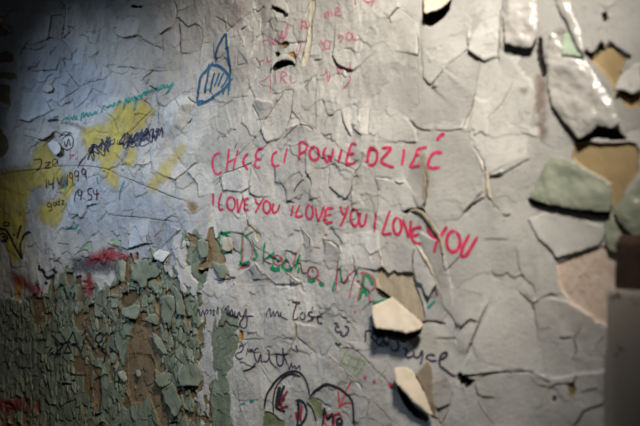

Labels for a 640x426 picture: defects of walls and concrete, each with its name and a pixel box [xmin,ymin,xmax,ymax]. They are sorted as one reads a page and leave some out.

crack [44,1,209,134]
flaking render [271,0,316,70]
peeling [423,0,450,14]
flaking render [0,249,212,426]
crack [109,215,190,262]
flaking render [187,227,233,279]
crack [217,78,343,292]
flaking render [371,245,439,334]
crack [422,306,487,355]
crack [464,198,510,216]
crack [475,329,603,426]
peeling [528,0,640,327]